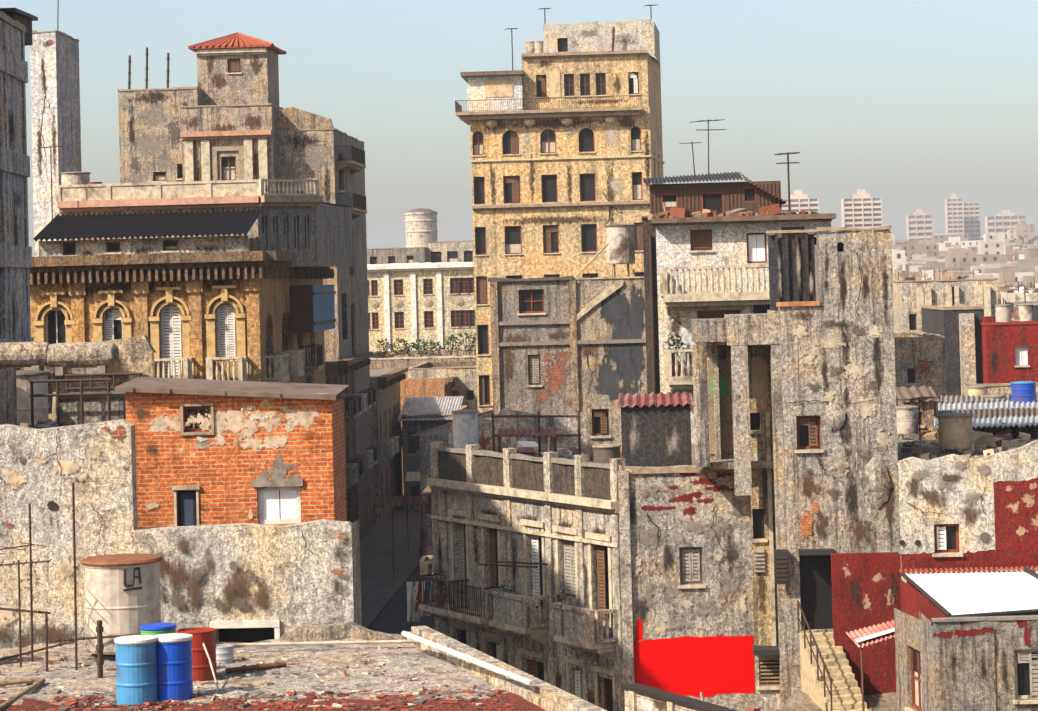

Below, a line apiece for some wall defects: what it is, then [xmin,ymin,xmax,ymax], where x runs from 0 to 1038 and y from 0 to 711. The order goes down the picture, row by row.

leakage [128,92,168,144]
leakage [872,337,883,395]
peeling [1,425,126,490]
peeling [194,405,323,452]
leakage [810,256,871,544]
crack [26,428,115,554]
leakage [906,474,960,508]
peeling [1005,483,1038,538]
leakage [156,536,212,611]
crack [647,513,674,614]
peeling [631,500,748,635]
peeling [872,572,896,608]